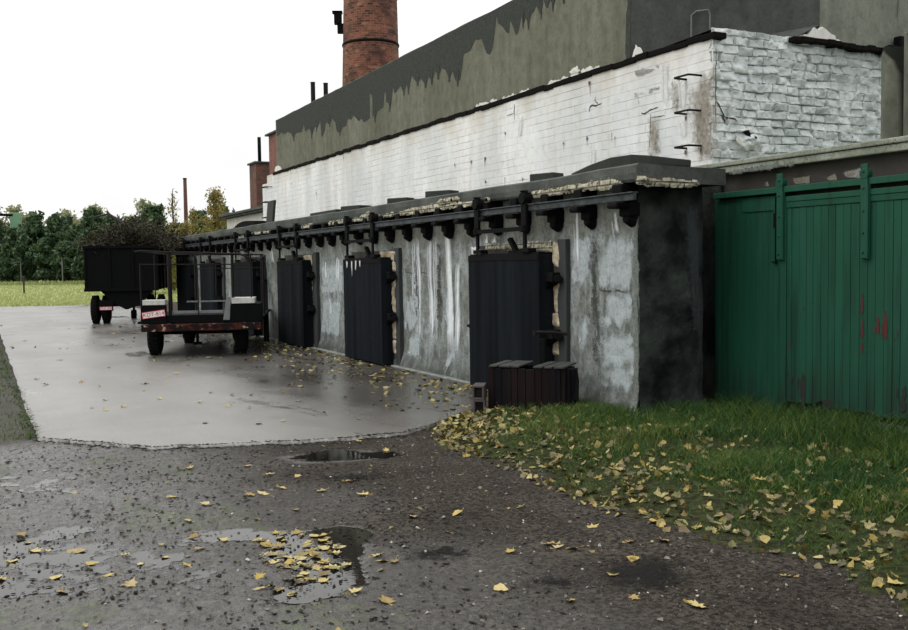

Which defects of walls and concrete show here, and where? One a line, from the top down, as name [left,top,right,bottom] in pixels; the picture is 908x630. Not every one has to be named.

peeling [548,65,600,85]
spalling [532,178,623,198]
spalling [636,174,700,188]
damp [412,237,460,347]
damp [589,238,603,378]